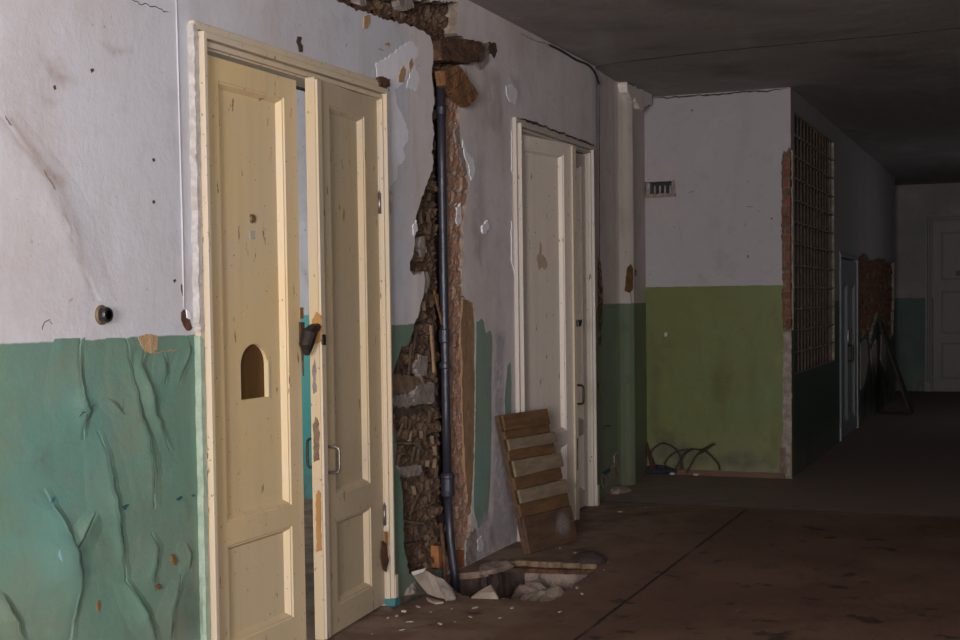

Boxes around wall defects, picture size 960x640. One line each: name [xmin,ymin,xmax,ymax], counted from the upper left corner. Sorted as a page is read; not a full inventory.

spalling [337,0,451,40]
peeling [376,41,420,201]
spalling [474,41,497,69]
spalling [138,334,158,353]
spalling [392,63,599,602]
spalling [771,148,793,476]
spalling [858,254,893,390]